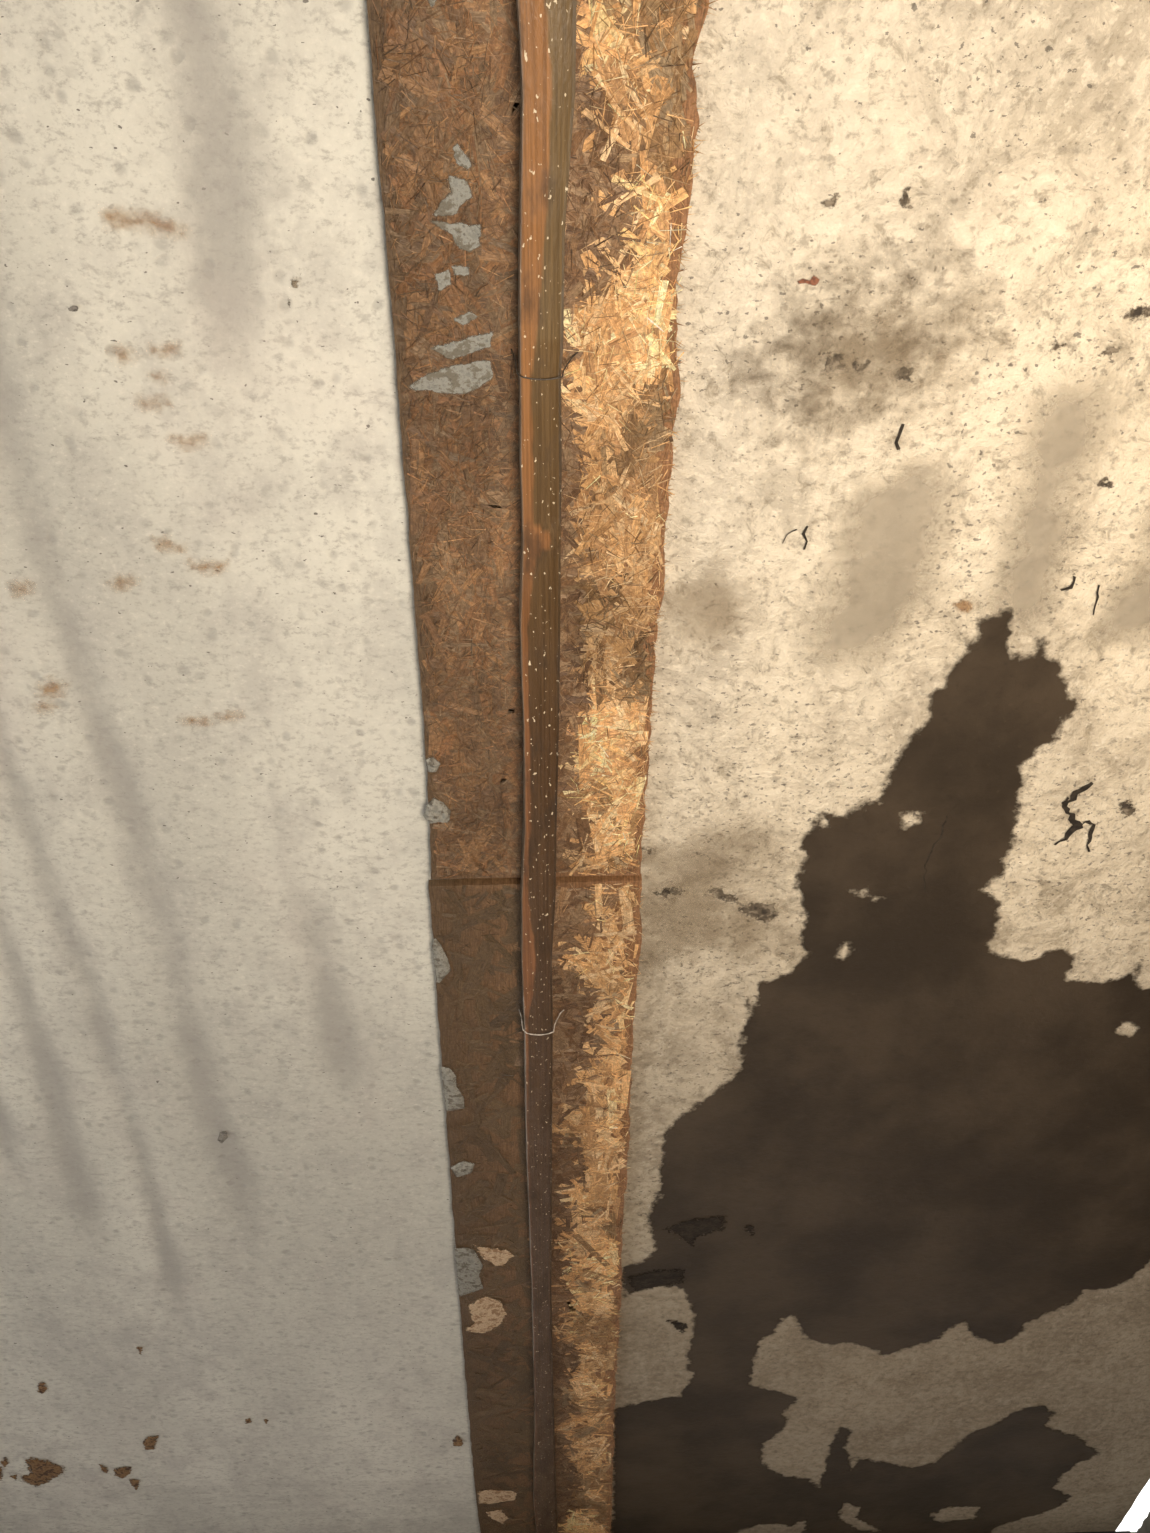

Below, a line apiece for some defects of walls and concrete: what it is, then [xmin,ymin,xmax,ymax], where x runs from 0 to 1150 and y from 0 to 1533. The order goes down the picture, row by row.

leakage [610,401,1150,1533]
crack [1054,782,1096,852]